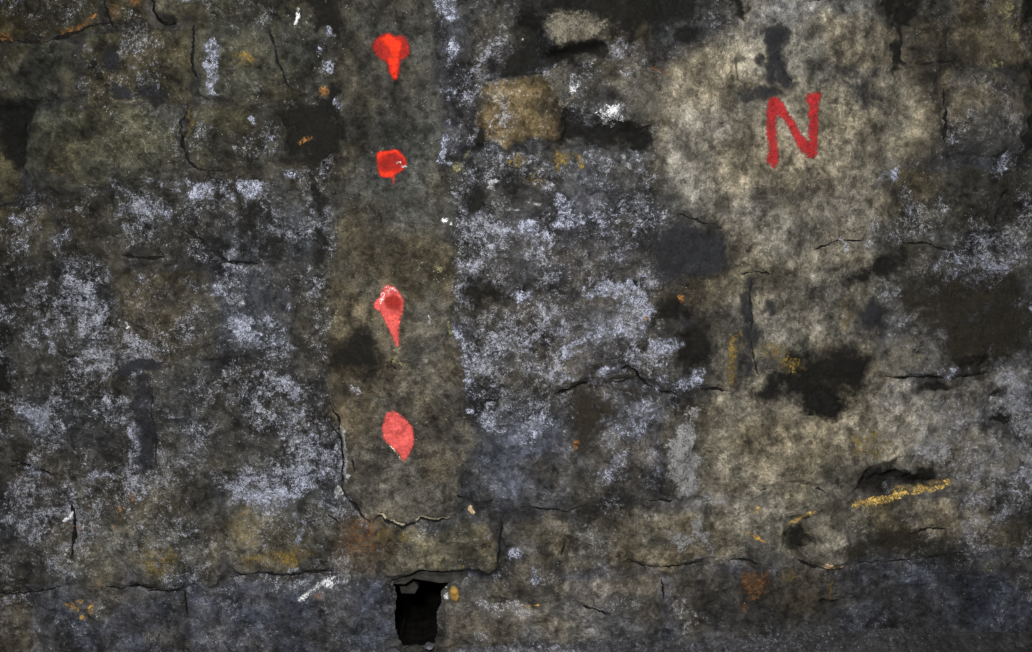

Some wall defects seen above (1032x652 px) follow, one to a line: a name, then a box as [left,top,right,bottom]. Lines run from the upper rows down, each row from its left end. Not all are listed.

leakage [839,208,884,265]
crack [555,365,725,394]
crack [328,404,470,529]
rust [852,479,951,507]